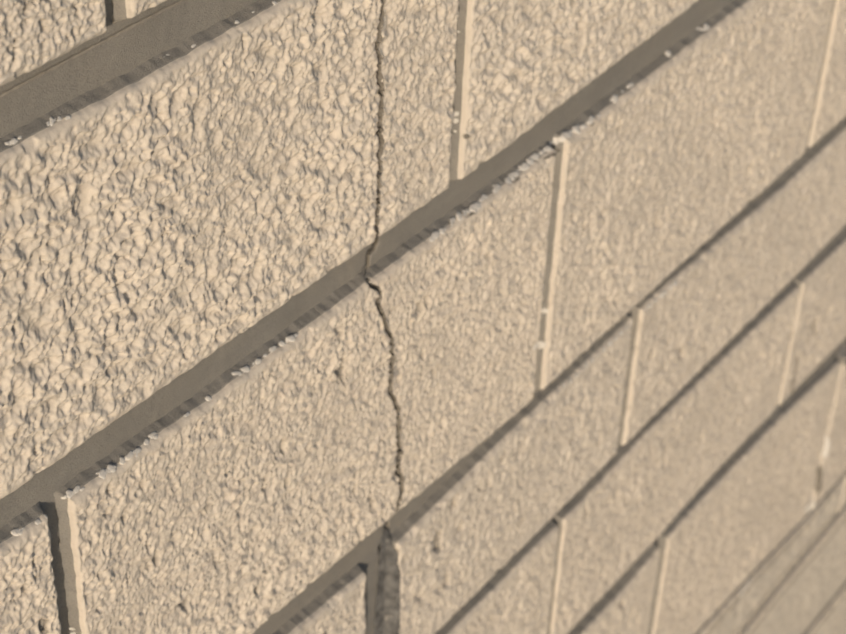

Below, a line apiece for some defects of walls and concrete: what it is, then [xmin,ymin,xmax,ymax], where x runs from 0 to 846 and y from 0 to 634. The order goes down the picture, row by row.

crack [364,0,405,554]